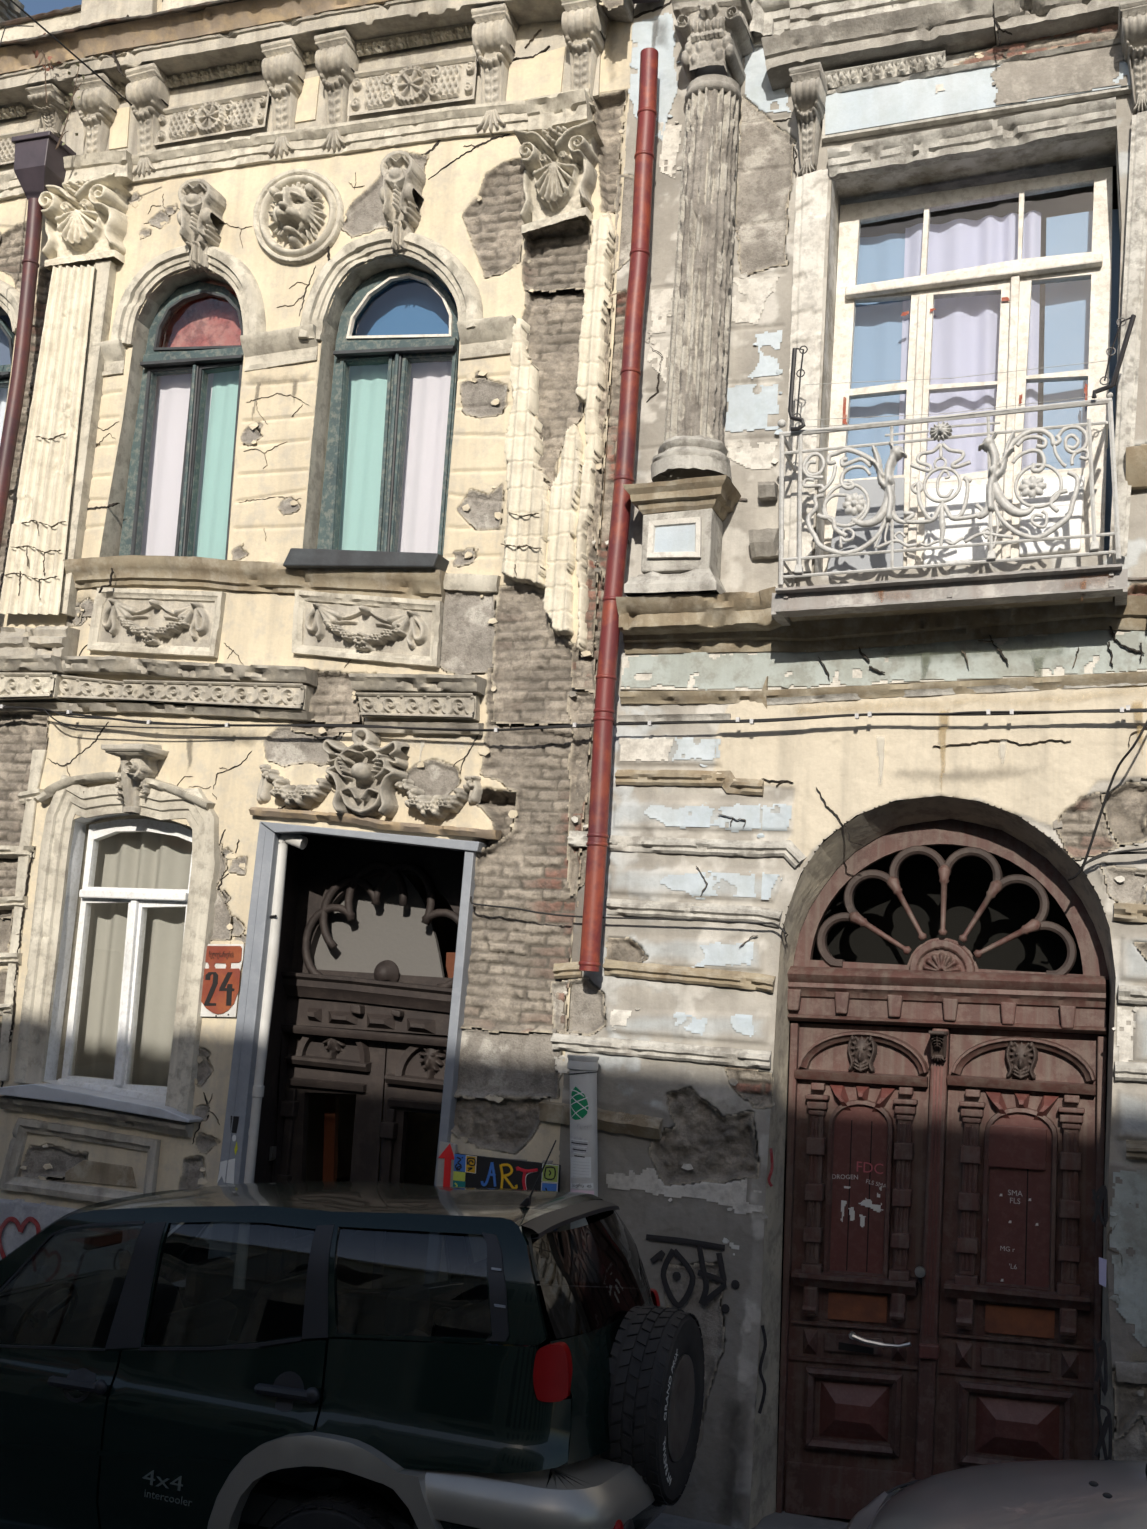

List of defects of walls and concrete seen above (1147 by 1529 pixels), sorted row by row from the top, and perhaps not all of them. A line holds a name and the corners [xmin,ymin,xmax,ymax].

crack [421,134,510,180]
crack [277,246,330,316]
peeling [725,35,795,470]
flaking render [440,13,682,1154]
flaking render [0,712,49,1004]
crack [49,722,109,777]
crack [177,751,252,889]
peeling [406,760,460,797]
crack [762,778,864,846]
flaking render [1053,782,1147,904]
flaking render [606,1067,775,1219]
peeling [1109,1170,1147,1347]